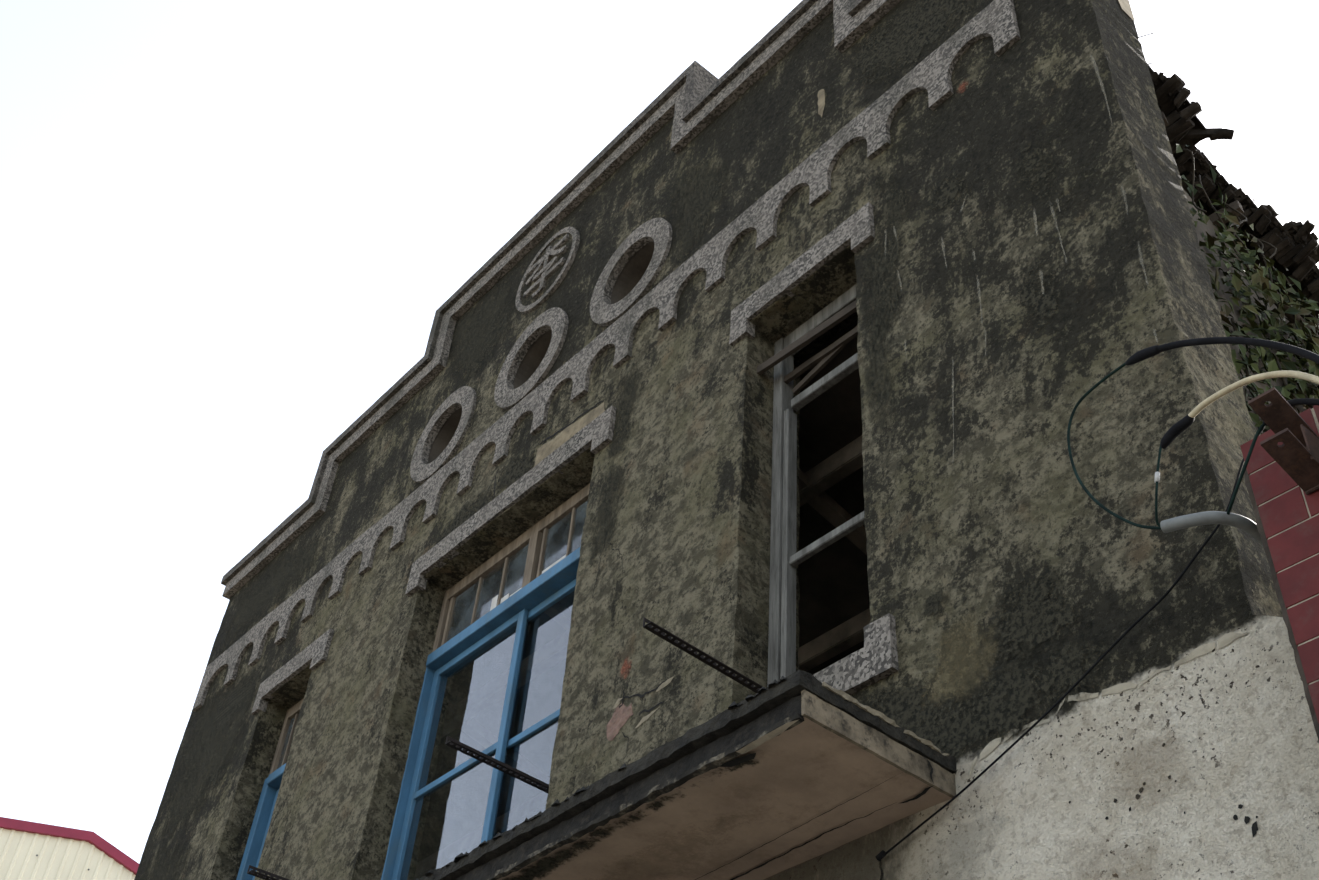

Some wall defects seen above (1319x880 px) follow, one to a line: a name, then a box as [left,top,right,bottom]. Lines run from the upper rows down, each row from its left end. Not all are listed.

damp [864,569,1106,758]
spalling [606,675,675,741]
damp [507,794,683,880]